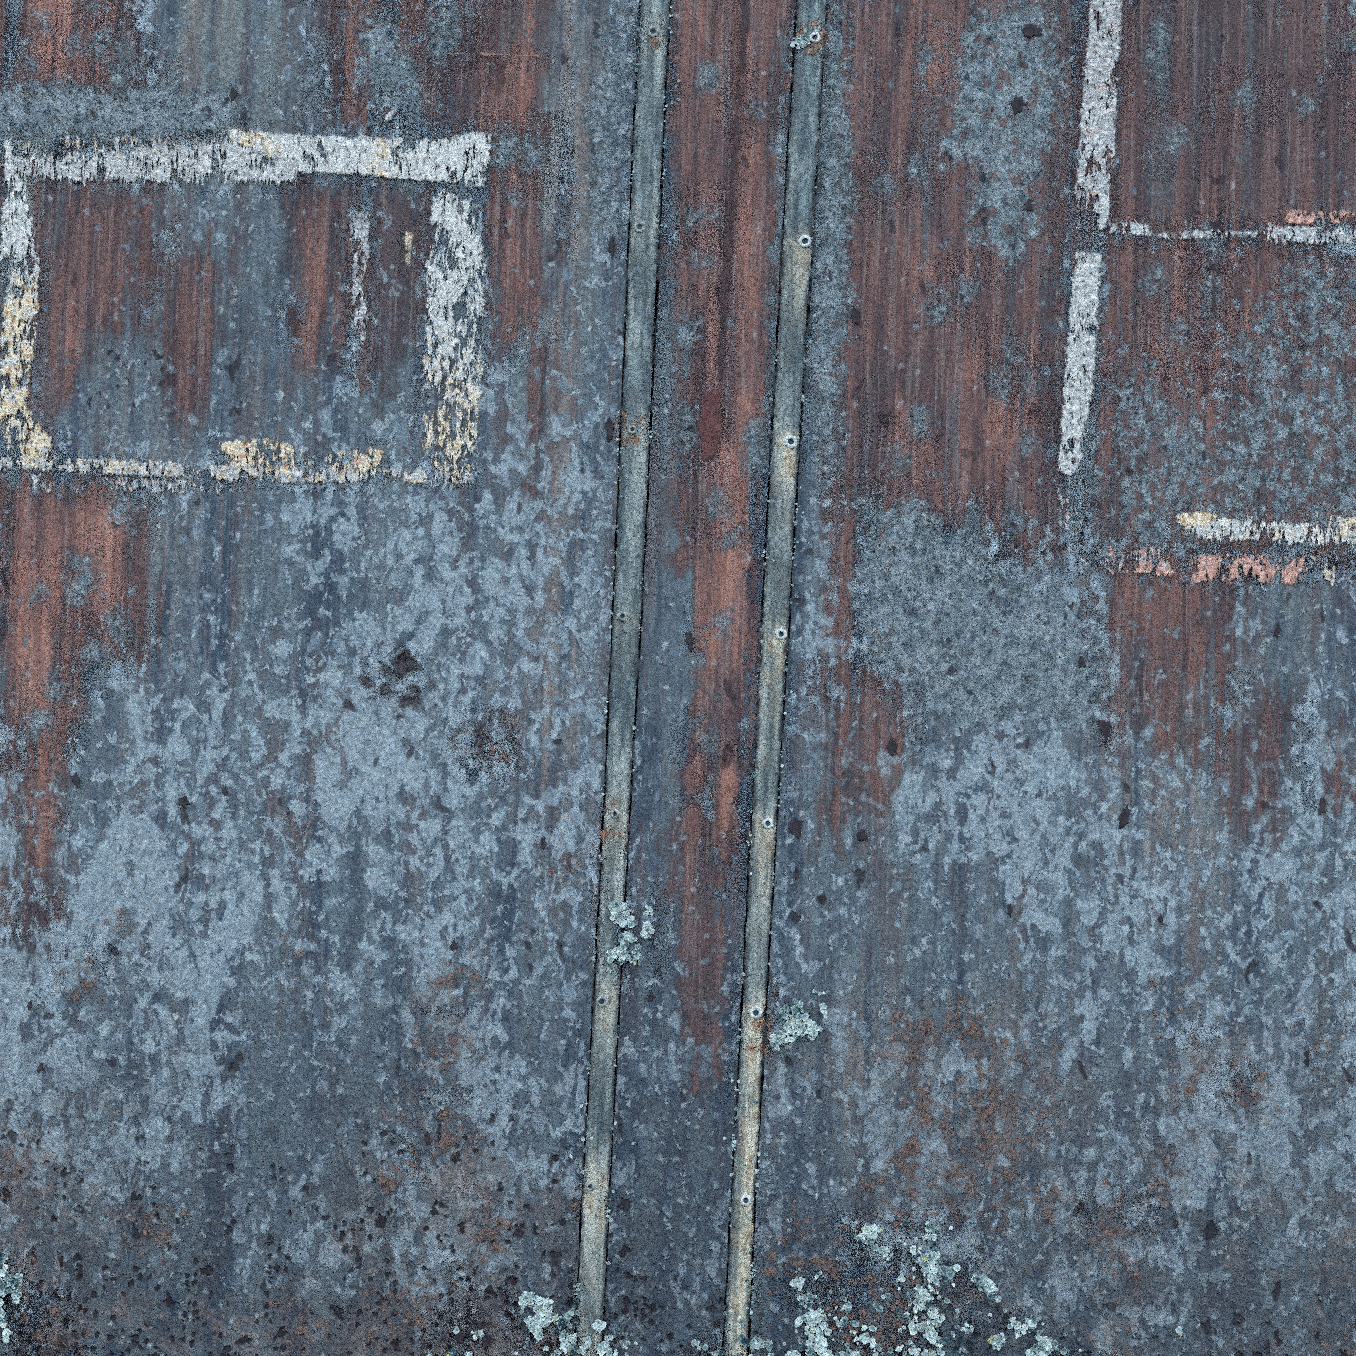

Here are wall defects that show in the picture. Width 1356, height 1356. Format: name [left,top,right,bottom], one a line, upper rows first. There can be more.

peeling [0,467,163,958]
peeling [19,169,236,443]
peeling [277,174,436,417]
peeling [394,0,572,500]
peeling [652,0,797,1095]
peeling [788,0,1356,880]
rust [424,947,484,1004]
rust [8,1254,90,1356]
rust [256,1283,343,1356]
rust [353,1021,524,1356]
rust [754,979,1082,1356]
rust [1080,1143,1187,1304]